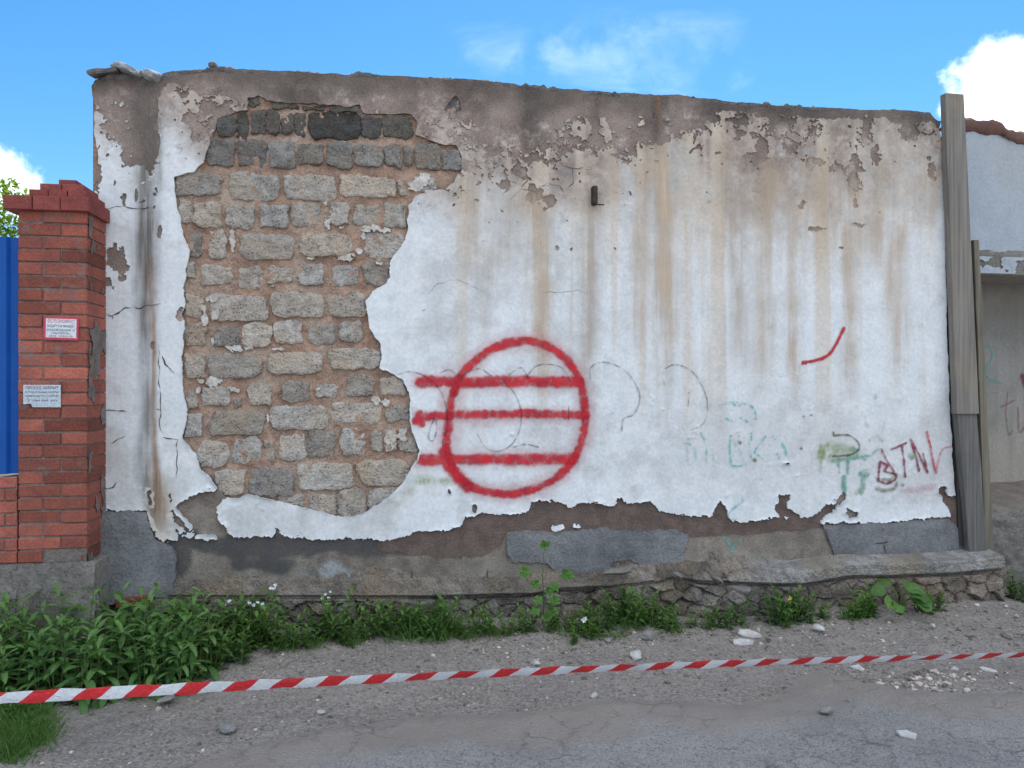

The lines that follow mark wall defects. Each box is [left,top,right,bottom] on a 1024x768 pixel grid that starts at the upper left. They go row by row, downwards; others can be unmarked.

spalling [965,117,1024,144]
spalling [91,69,941,517]
leakage [656,155,671,320]
peeling [980,256,1024,274]
crack [158,356,178,474]
peeling [377,494,836,558]
peeling [939,486,957,526]